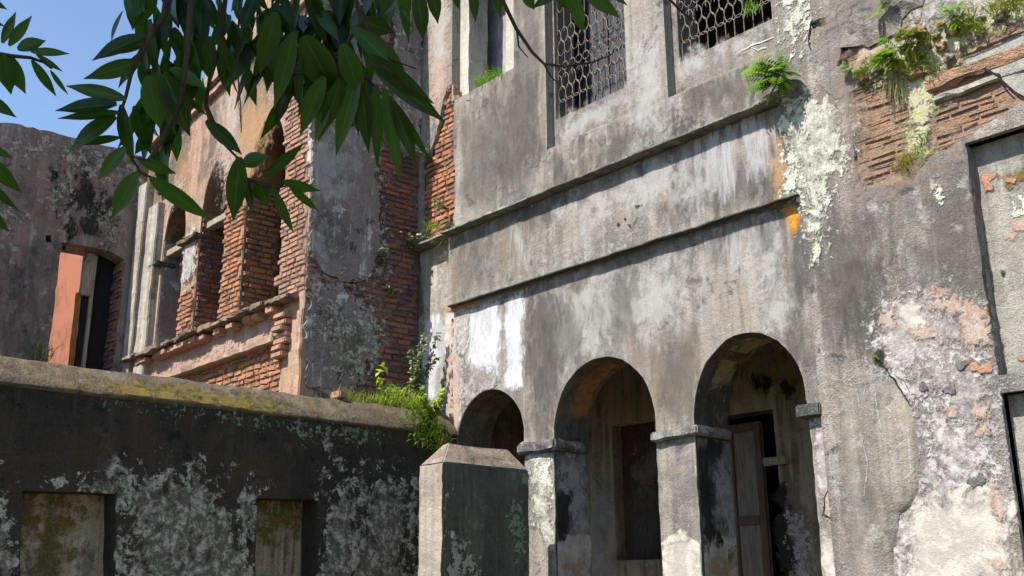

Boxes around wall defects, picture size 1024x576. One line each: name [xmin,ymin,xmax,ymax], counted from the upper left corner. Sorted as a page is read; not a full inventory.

damp [47,158,120,262]
flaking render [421,0,460,240]
damp [511,45,784,281]
spalling [816,0,1024,185]
damp [523,263,686,438]
crack [881,364,911,406]
peeling [858,276,1024,576]